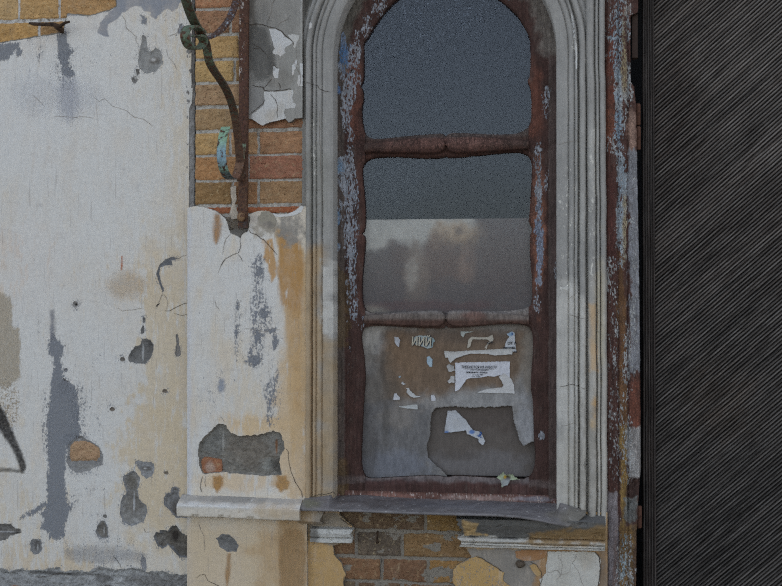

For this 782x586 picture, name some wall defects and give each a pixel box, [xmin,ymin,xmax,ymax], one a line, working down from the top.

spalling [0,0,117,88]
peeling [251,59,303,126]
peeling [269,29,299,56]
crack [249,2,329,117]
crack [218,230,275,272]
spalling [120,317,154,364]
peeling [0,314,103,554]
spalling [198,370,285,476]
spalling [120,460,155,526]
spalling [154,486,187,558]
flaking render [334,512,510,586]
peeling [515,550,601,586]